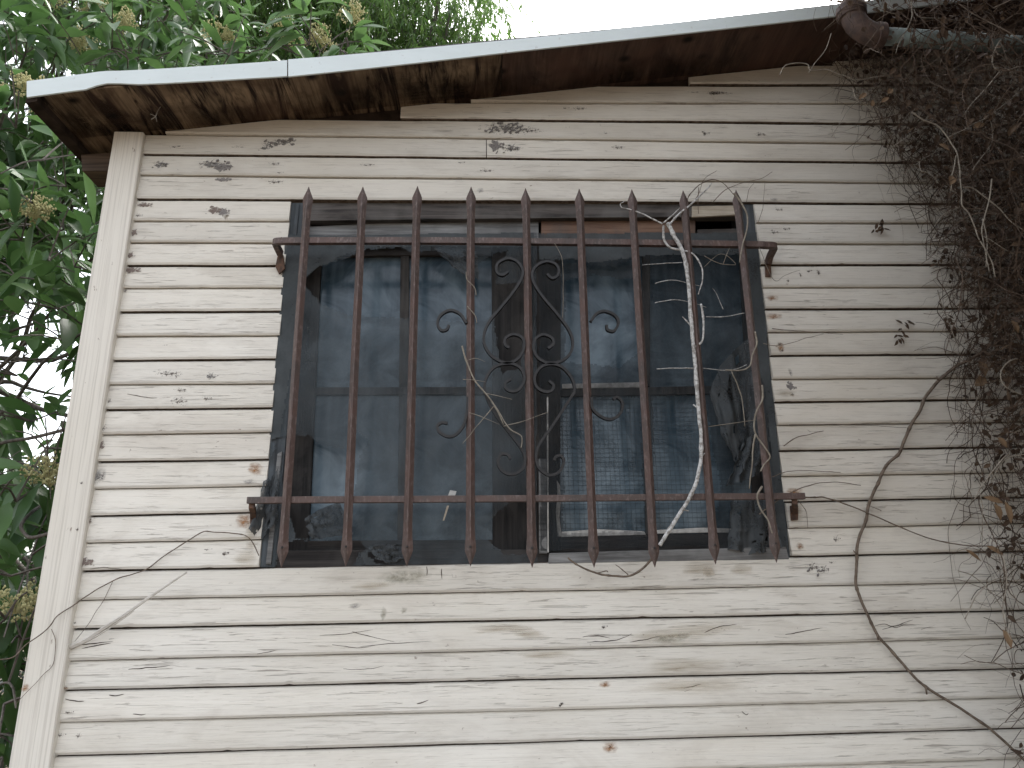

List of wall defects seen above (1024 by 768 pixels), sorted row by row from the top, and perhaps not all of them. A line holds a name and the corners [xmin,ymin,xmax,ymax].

peeling [262,138,296,150]
peeling [480,121,541,154]
peeling [199,159,233,182]
peeling [205,206,230,219]
crack [320,630,427,670]